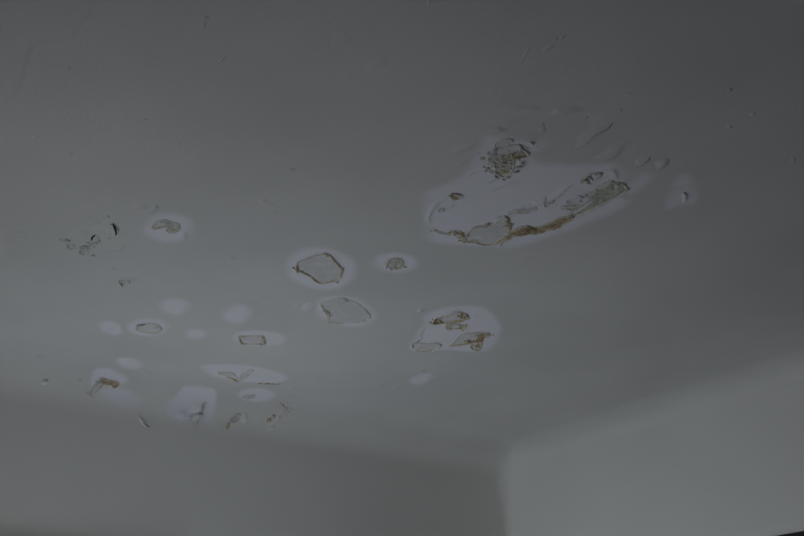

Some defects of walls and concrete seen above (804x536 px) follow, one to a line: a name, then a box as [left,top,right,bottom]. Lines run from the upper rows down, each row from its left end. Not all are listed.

flaking render [468,138,541,189]
peeling [428,169,631,247]
peeling [150,219,186,240]
peeling [292,252,345,285]
peeling [411,311,494,352]
peeling [87,377,120,398]